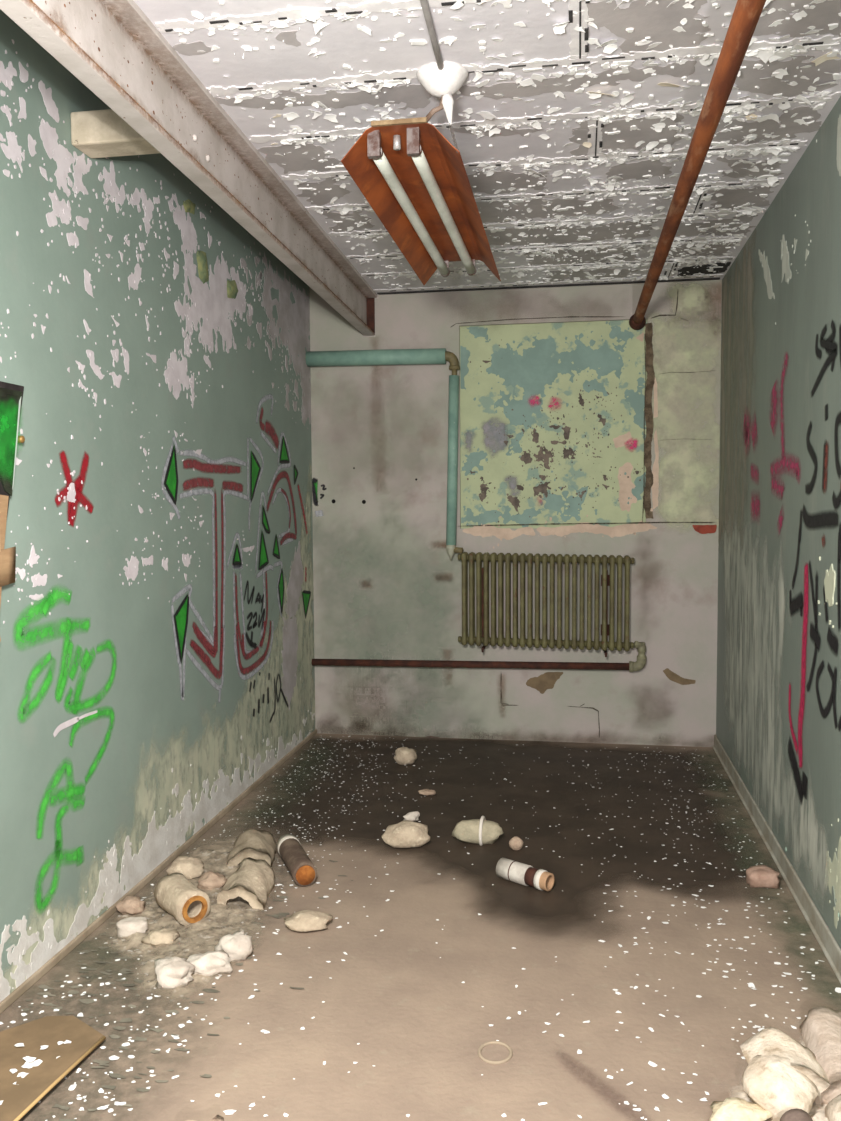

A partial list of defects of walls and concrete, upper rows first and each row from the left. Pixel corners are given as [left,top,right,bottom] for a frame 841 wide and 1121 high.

peeling [0,39,311,439]
peeling [0,470,323,1002]
peeling [119,430,208,586]
leakage [331,545,448,660]
peeling [171,0,841,929]
leakage [257,695,756,929]